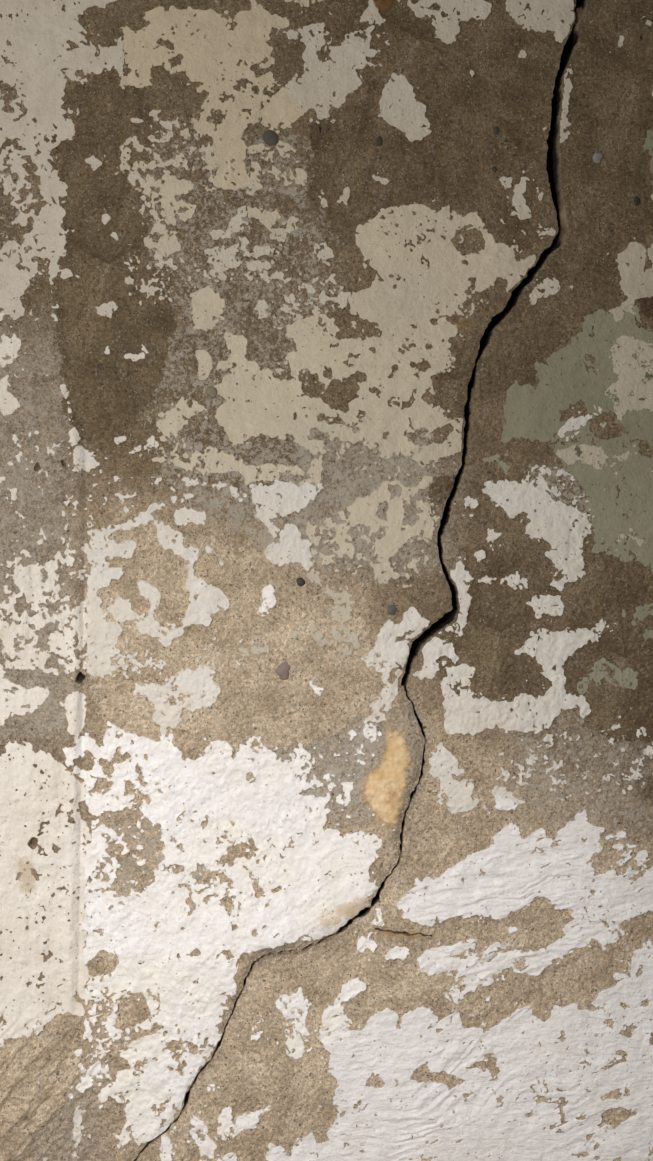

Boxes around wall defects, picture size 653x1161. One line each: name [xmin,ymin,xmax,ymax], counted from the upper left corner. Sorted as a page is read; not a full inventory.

peeling [185,205,299,331]
peeling [313,242,334,266]
peeling [0,331,27,368]
peeling [195,349,213,380]
peeling [0,368,24,423]
peeling [8,431,51,494]
peeling [174,507,206,528]
peeling [462,496,479,517]
crack [134,0,587,1161]
peeling [492,732,580,811]
peeling [336,779,354,819]
peeling [72,1105,91,1159]